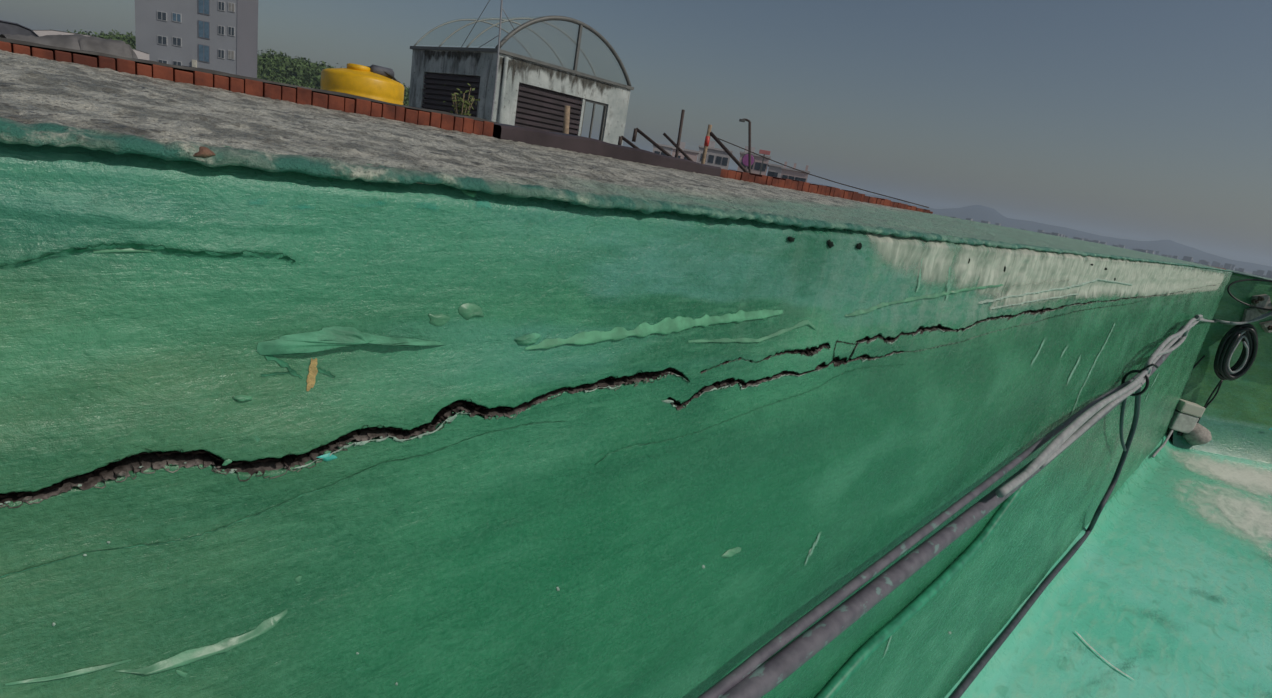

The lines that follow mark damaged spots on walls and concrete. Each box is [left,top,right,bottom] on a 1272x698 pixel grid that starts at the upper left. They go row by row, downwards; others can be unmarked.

crack [0,285,1215,578]